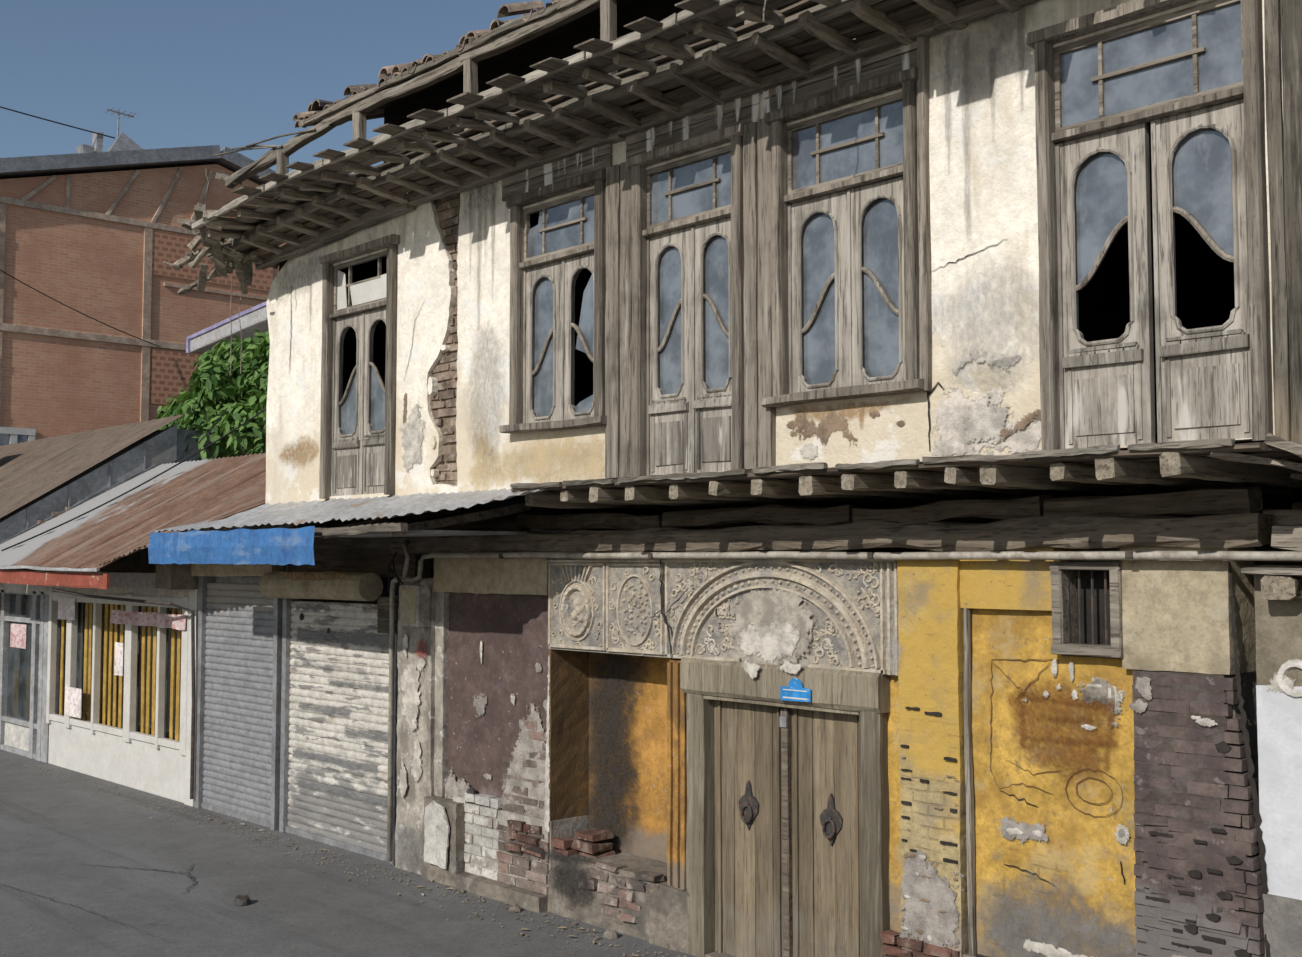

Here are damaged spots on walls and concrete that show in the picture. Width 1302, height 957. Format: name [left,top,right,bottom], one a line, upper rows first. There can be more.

crack [935,239,1005,270]
spalling [400,193,460,486]
flaking render [787,409,857,460]
crack [927,382,944,451]
flaking render [725,582,817,679]
peeling [293,628,425,806]
peeling [424,655,665,923]
peeling [880,848,964,957]
peeling [1023,938,1092,957]